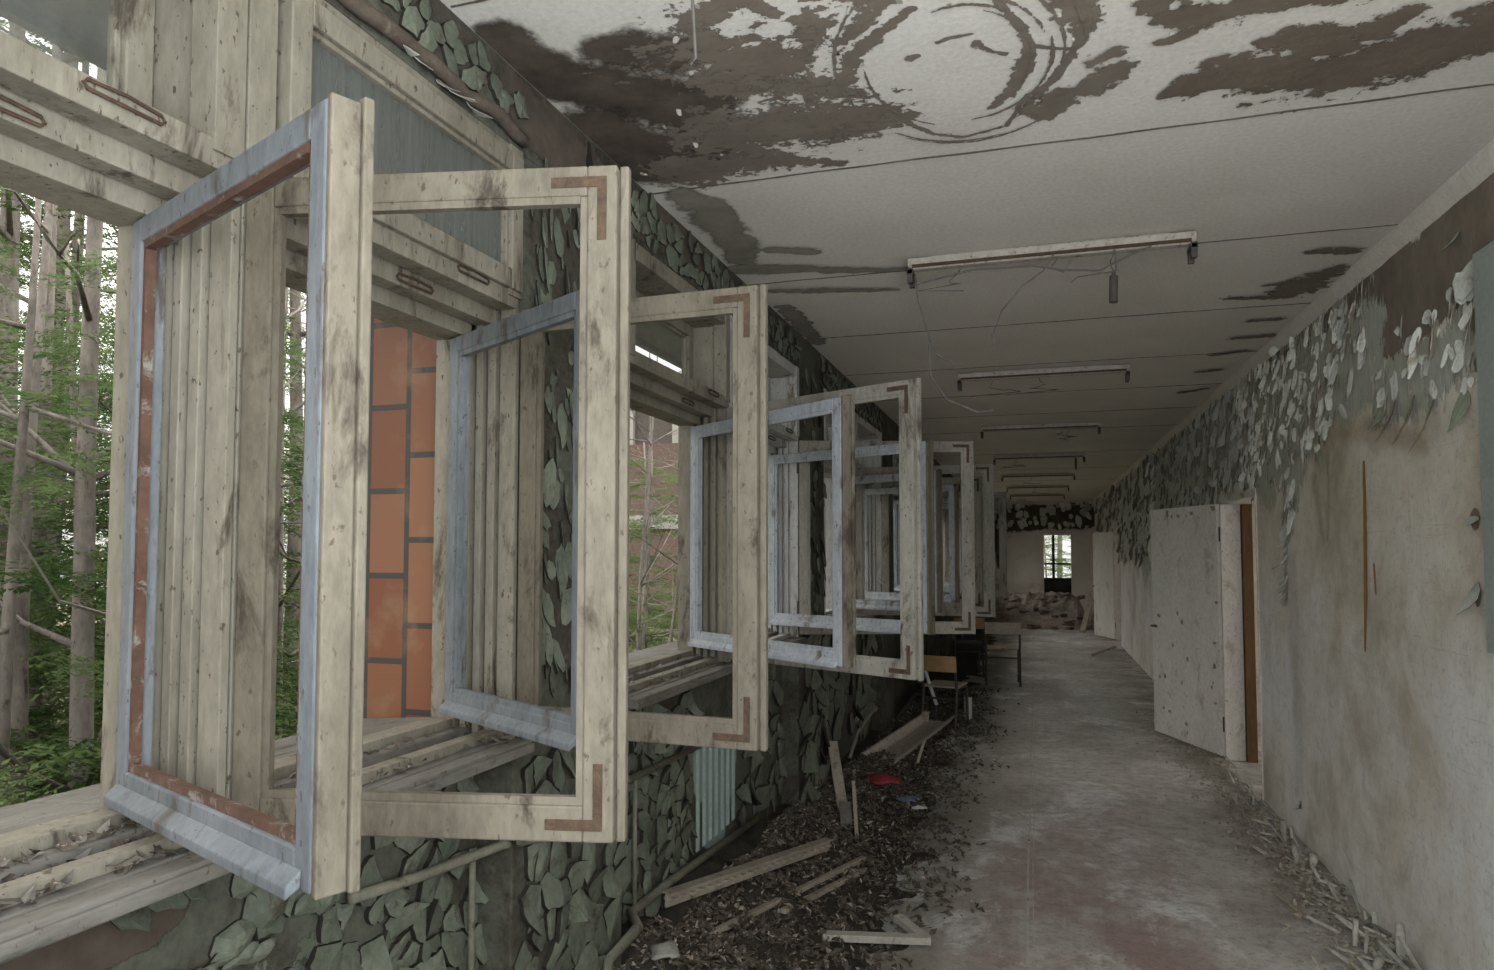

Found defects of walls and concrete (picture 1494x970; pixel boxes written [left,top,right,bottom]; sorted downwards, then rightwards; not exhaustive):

peeling [1130,0,1494,114]
peeling [380,0,1145,291]
peeling [530,208,581,306]
peeling [768,315,883,432]
spalling [994,173,1494,606]
peeling [810,461,827,615]
peeling [436,776,479,792]
spalling [0,884,209,970]
peeling [252,836,489,970]